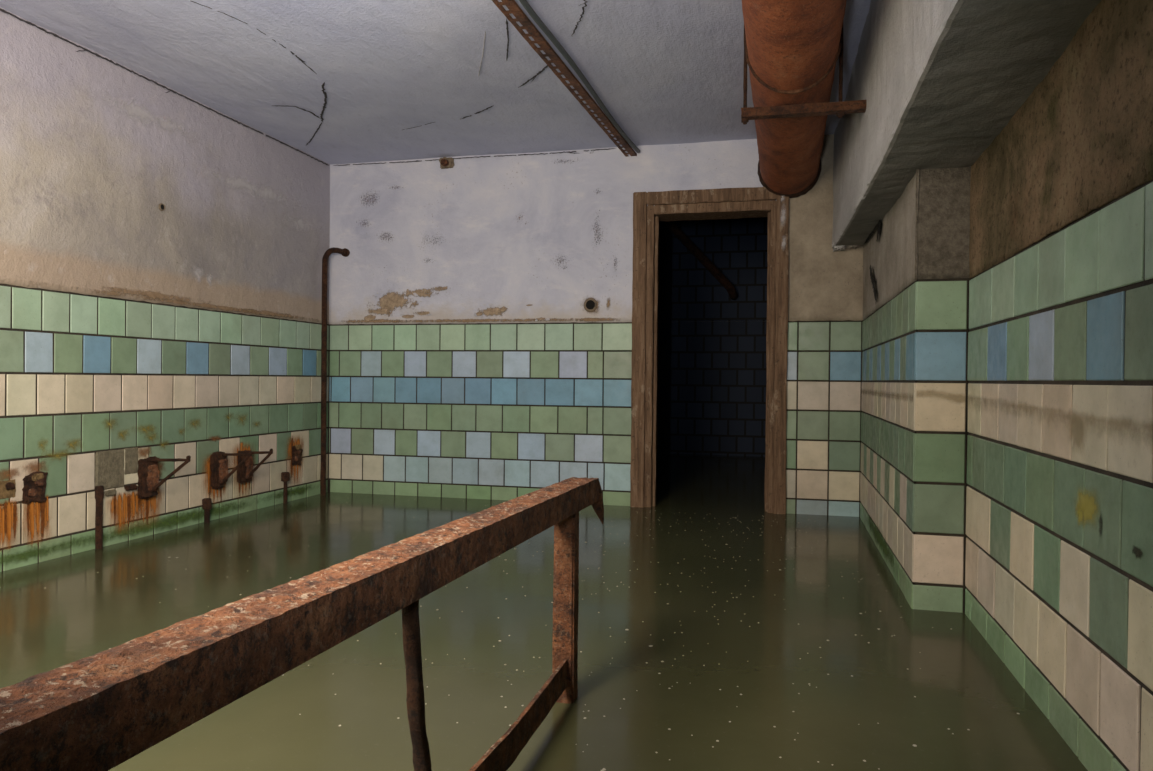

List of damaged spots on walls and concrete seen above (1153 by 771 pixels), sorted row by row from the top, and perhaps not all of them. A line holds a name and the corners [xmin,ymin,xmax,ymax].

crack [0,0,616,166]
peeling [346,287,614,323]
corrosion [205,442,250,500]
corrosion [0,496,49,545]
corrosion [110,490,161,527]